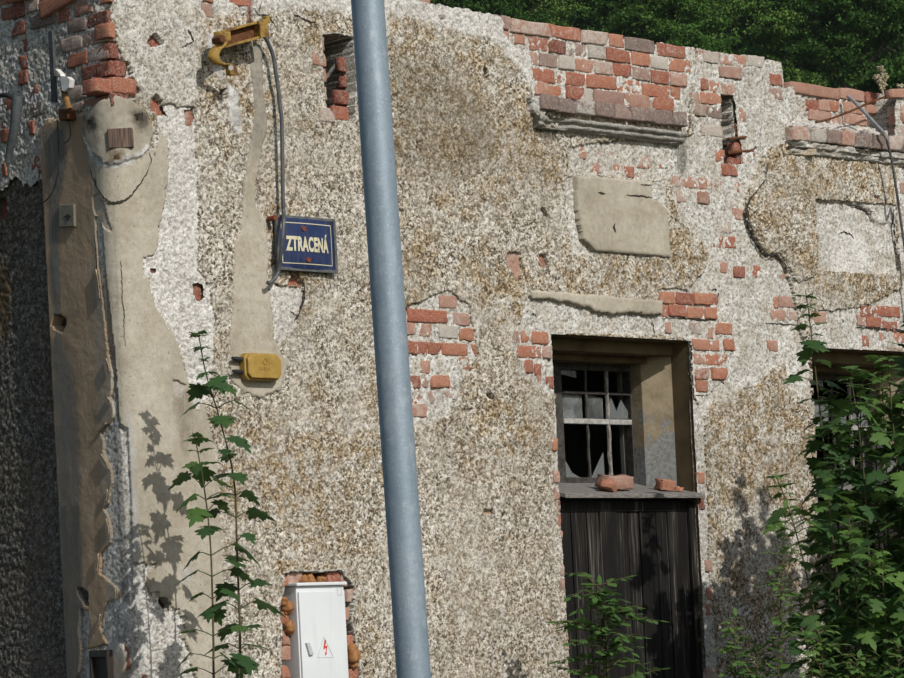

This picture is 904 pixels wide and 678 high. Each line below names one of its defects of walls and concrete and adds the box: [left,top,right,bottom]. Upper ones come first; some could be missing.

flaking render [0,0,137,191]
flaking render [200,0,214,19]
flaking render [229,0,251,8]
peeling [80,194,195,678]
flaking render [406,290,477,428]
flaking render [499,15,904,678]